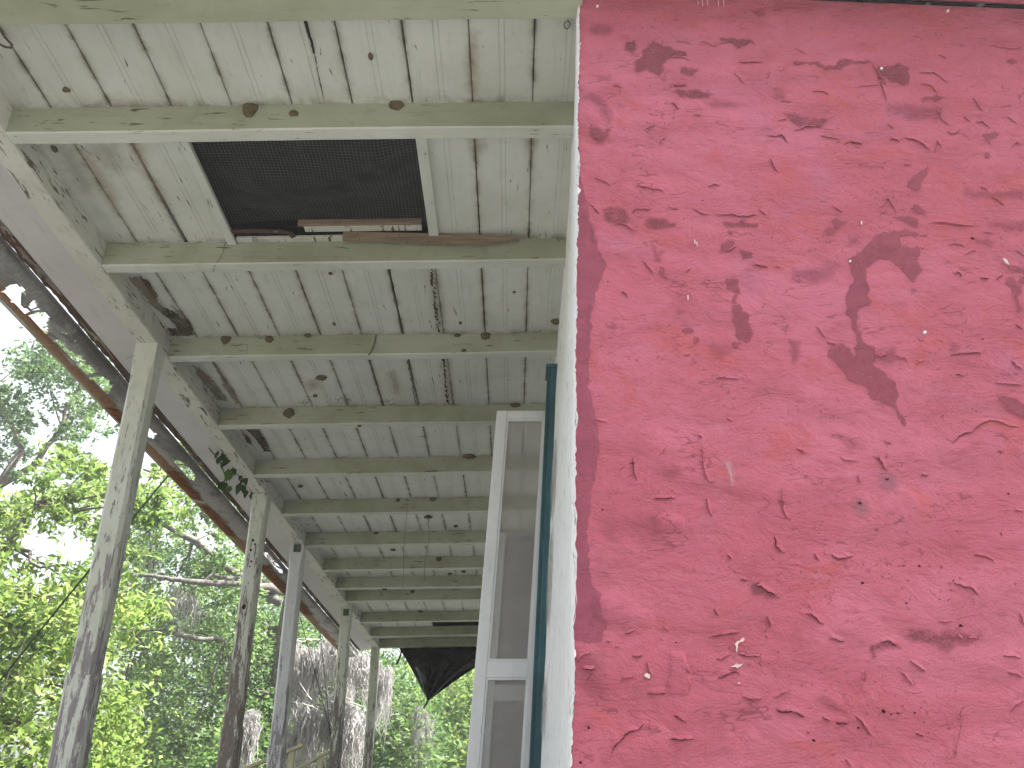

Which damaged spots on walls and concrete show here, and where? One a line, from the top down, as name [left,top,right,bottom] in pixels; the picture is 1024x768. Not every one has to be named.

spalling [625,41,697,75]
spalling [794,59,910,85]
peeling [129,276,196,337]
corrosion [106,408,122,423]